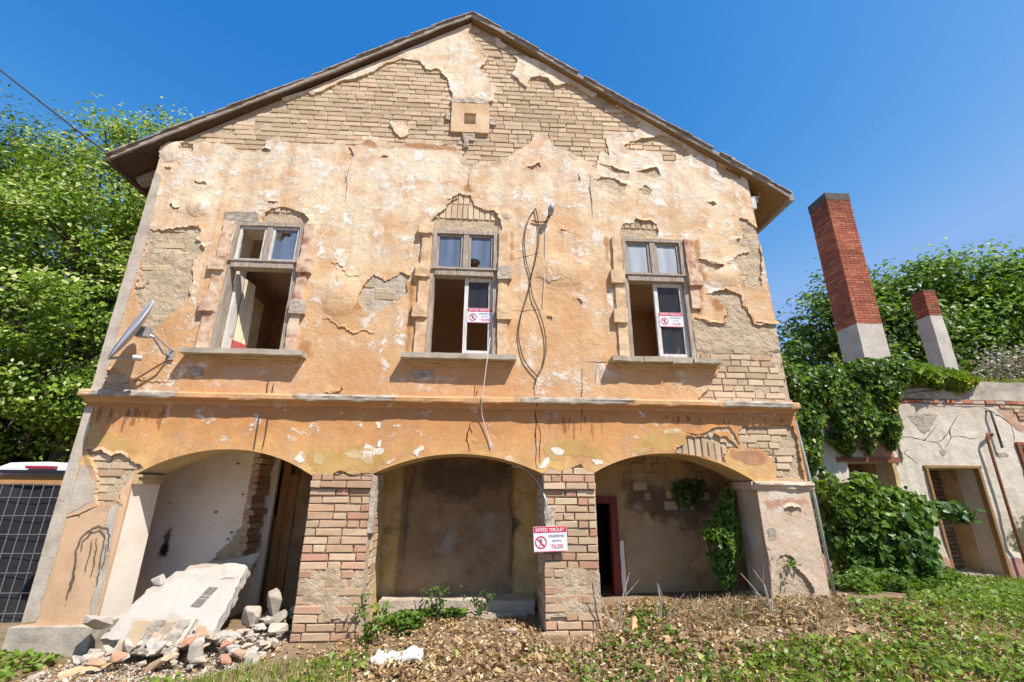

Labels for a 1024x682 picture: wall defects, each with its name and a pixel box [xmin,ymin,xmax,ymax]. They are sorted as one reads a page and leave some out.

spalling [180,28,689,195]
spalling [430,194,502,232]
spalling [619,217,658,237]
spalling [135,224,207,331]
spalling [331,261,410,313]
spalling [693,219,789,402]
spalling [84,425,143,505]
spalling [620,425,805,528]
crack [904,416,974,462]